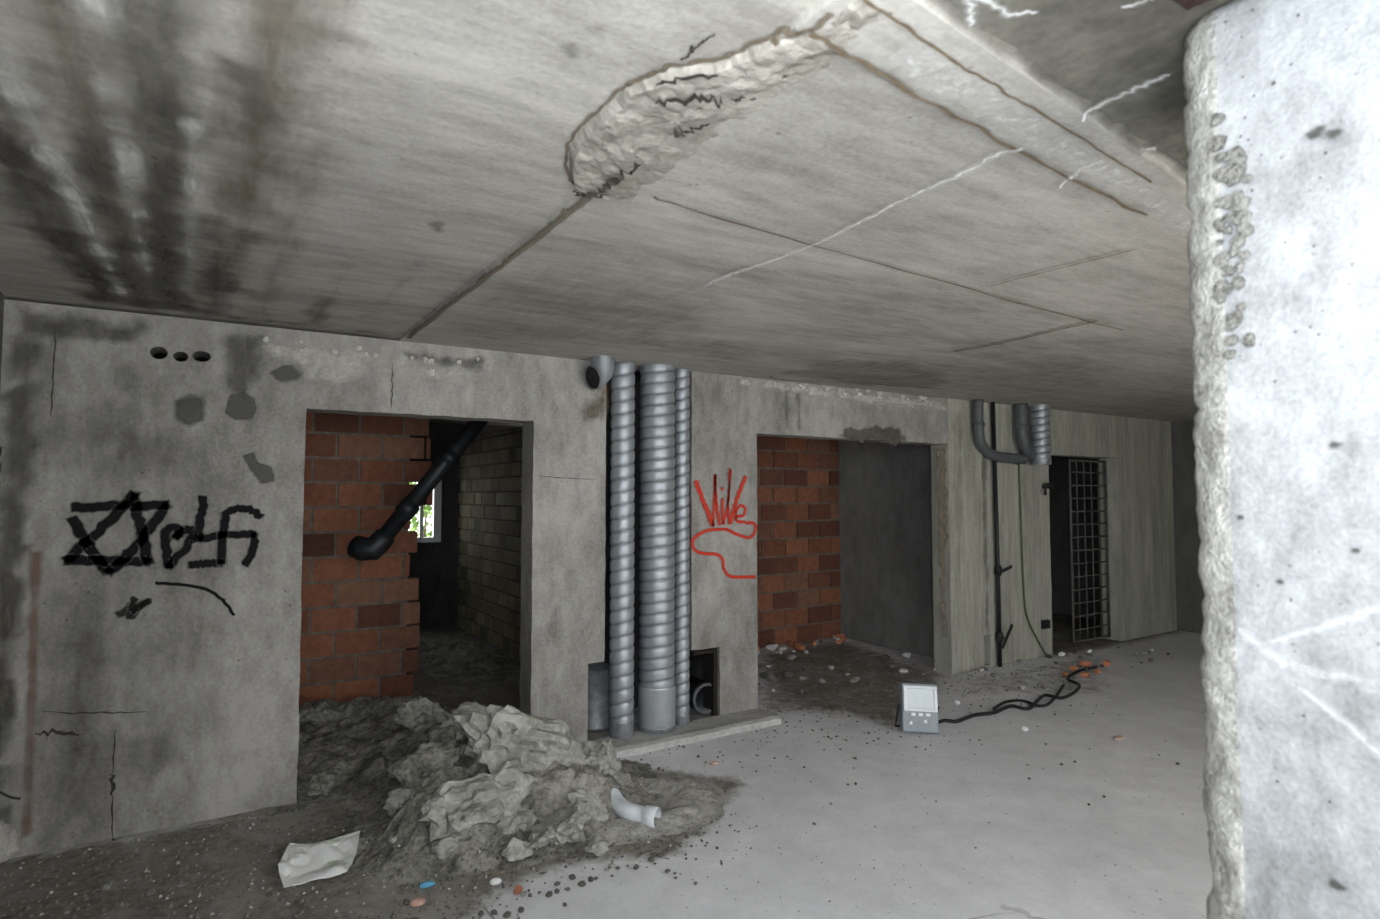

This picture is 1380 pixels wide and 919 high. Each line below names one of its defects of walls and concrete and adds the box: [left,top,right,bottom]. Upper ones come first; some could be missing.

damp [25,314,144,340]
damp [0,0,253,315]
damp [219,0,302,214]
crack [680,34,715,61]
spalling [564,0,894,201]
crack [653,196,1136,352]
crack [809,0,1152,216]
spalling [1207,113,1255,359]